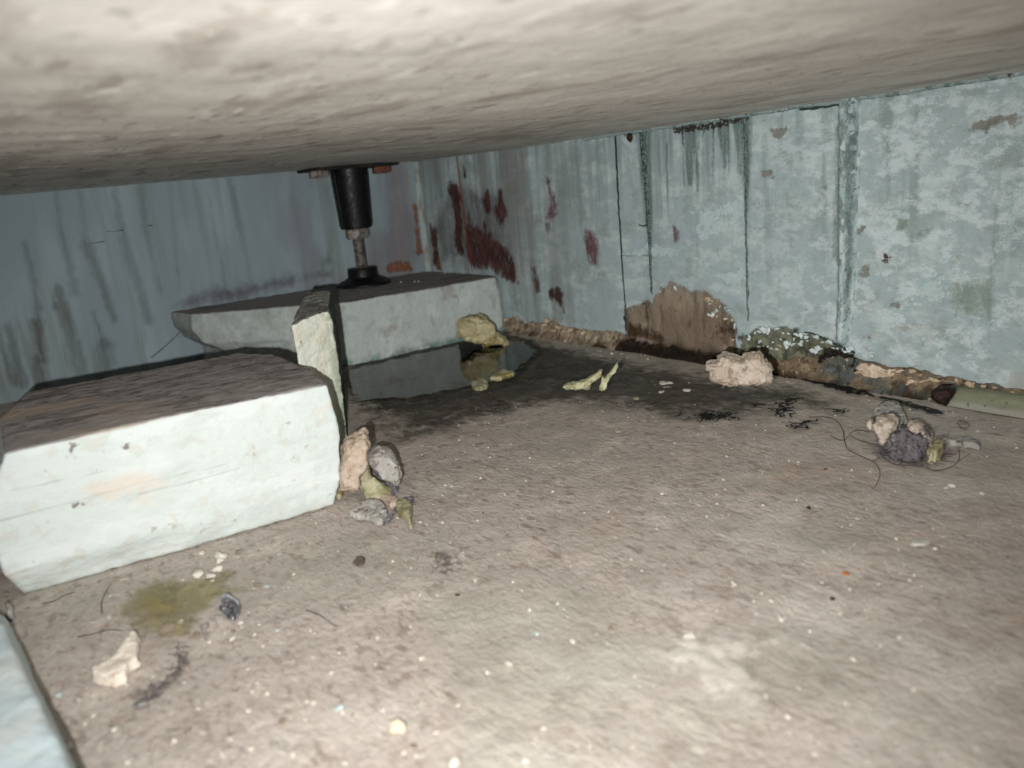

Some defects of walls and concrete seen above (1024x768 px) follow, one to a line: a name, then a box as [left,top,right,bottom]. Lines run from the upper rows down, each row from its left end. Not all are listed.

rust [386,204,442,273]
water stain [639,131,652,294]
water stain [673,117,875,368]
water stain [355,333,850,440]
spalling [504,281,738,391]
spalling [768,355,1024,403]
water stain [126,574,228,635]